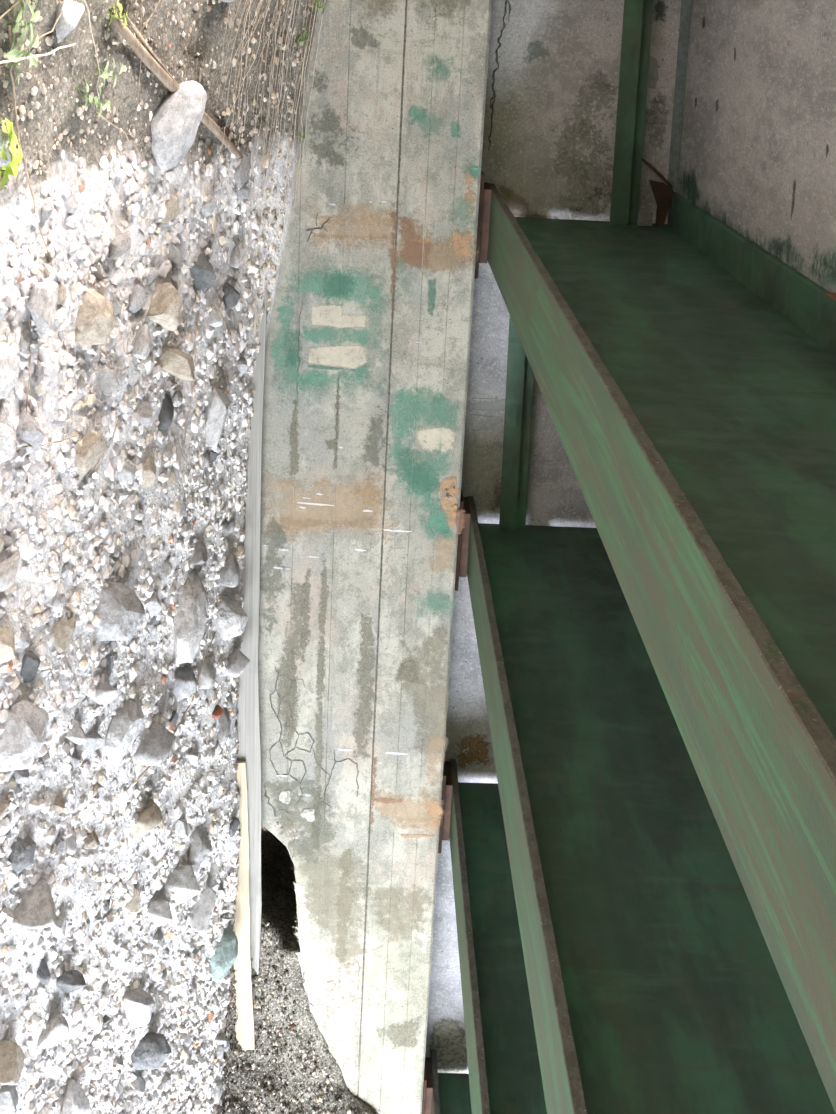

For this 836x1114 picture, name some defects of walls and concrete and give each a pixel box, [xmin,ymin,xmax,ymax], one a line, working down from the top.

crack [488,0,511,151]
rust [389,168,478,308]
damp [260,518,329,848]
crack [264,667,359,839]
damp [353,614,409,764]